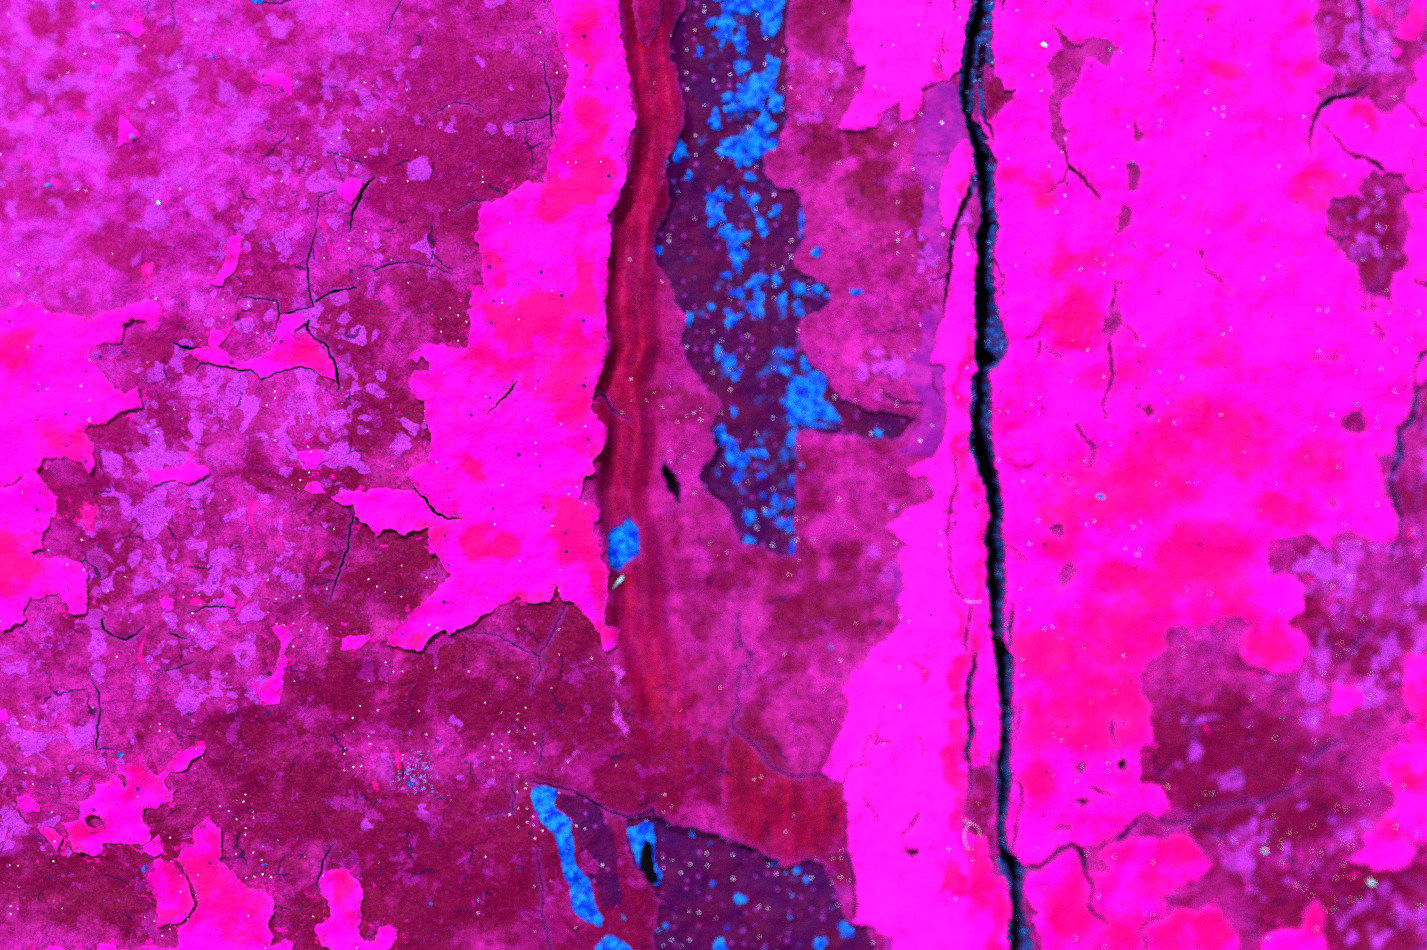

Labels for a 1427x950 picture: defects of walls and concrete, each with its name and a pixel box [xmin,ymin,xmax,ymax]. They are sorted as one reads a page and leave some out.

crack [1308,0,1427,193]
peeling [297,0,636,652]
peeling [1325,171,1410,298]
crack [1360,253,1427,327]
peeling [0,300,164,633]
leakage [607,517,639,571]
crack [881,0,1338,950]
crack [1339,350,1427,657]
leakage [611,666,629,736]
peeling [16,746,294,950]
peeling [314,868,398,950]
peeling [1022,833,1240,950]